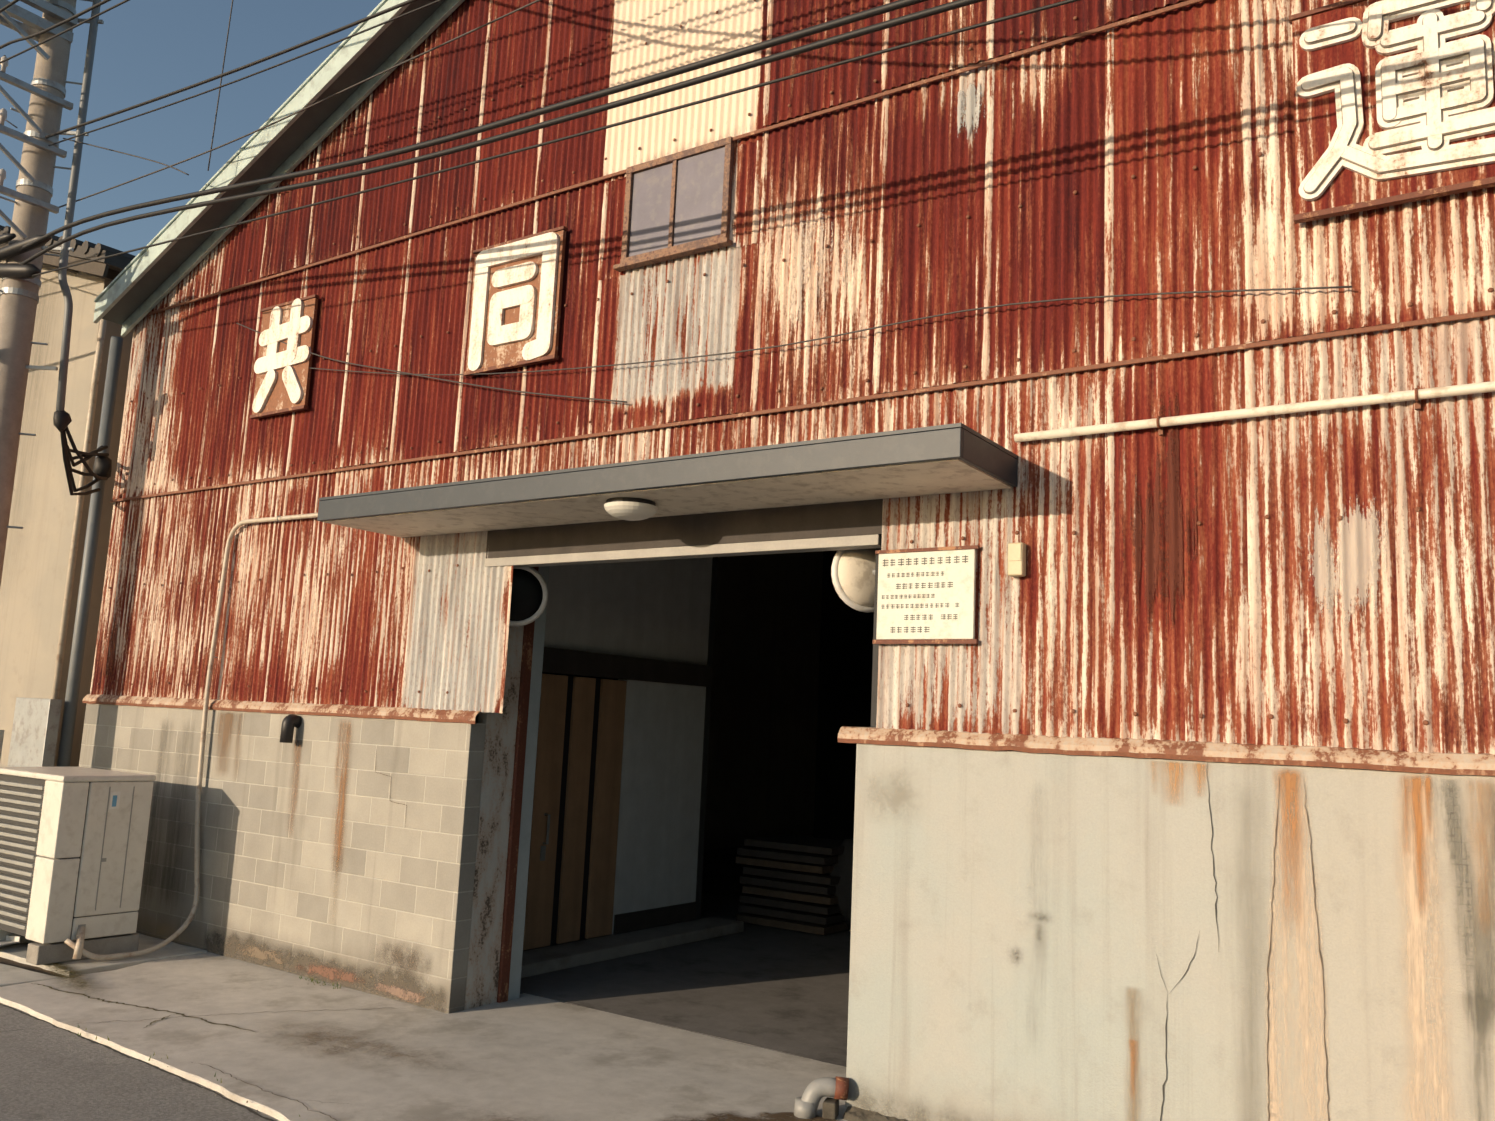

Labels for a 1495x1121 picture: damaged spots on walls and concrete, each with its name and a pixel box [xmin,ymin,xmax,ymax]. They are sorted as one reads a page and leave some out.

corrosion [97,615,118,676]
corrosion [1122,394,1197,632]
crack [1157,763,1219,1121]
corrosion [1268,771,1324,1121]
corrosion [1403,777,1445,1121]
leakage [1446,784,1495,1063]
leakage [690,1112,837,1121]